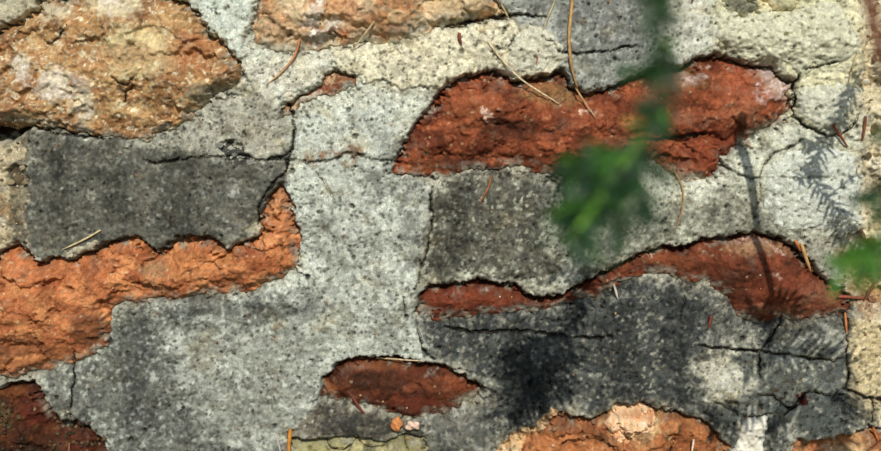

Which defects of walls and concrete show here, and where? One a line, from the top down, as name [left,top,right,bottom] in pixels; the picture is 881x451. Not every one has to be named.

crack [447,14,543,26]
crack [720,62,859,185]
peeling [62,240,98,258]
crack [403,182,435,360]
crack [444,326,609,339]
crack [699,317,881,422]
spalling [497,407,558,451]
peeling [605,401,656,444]